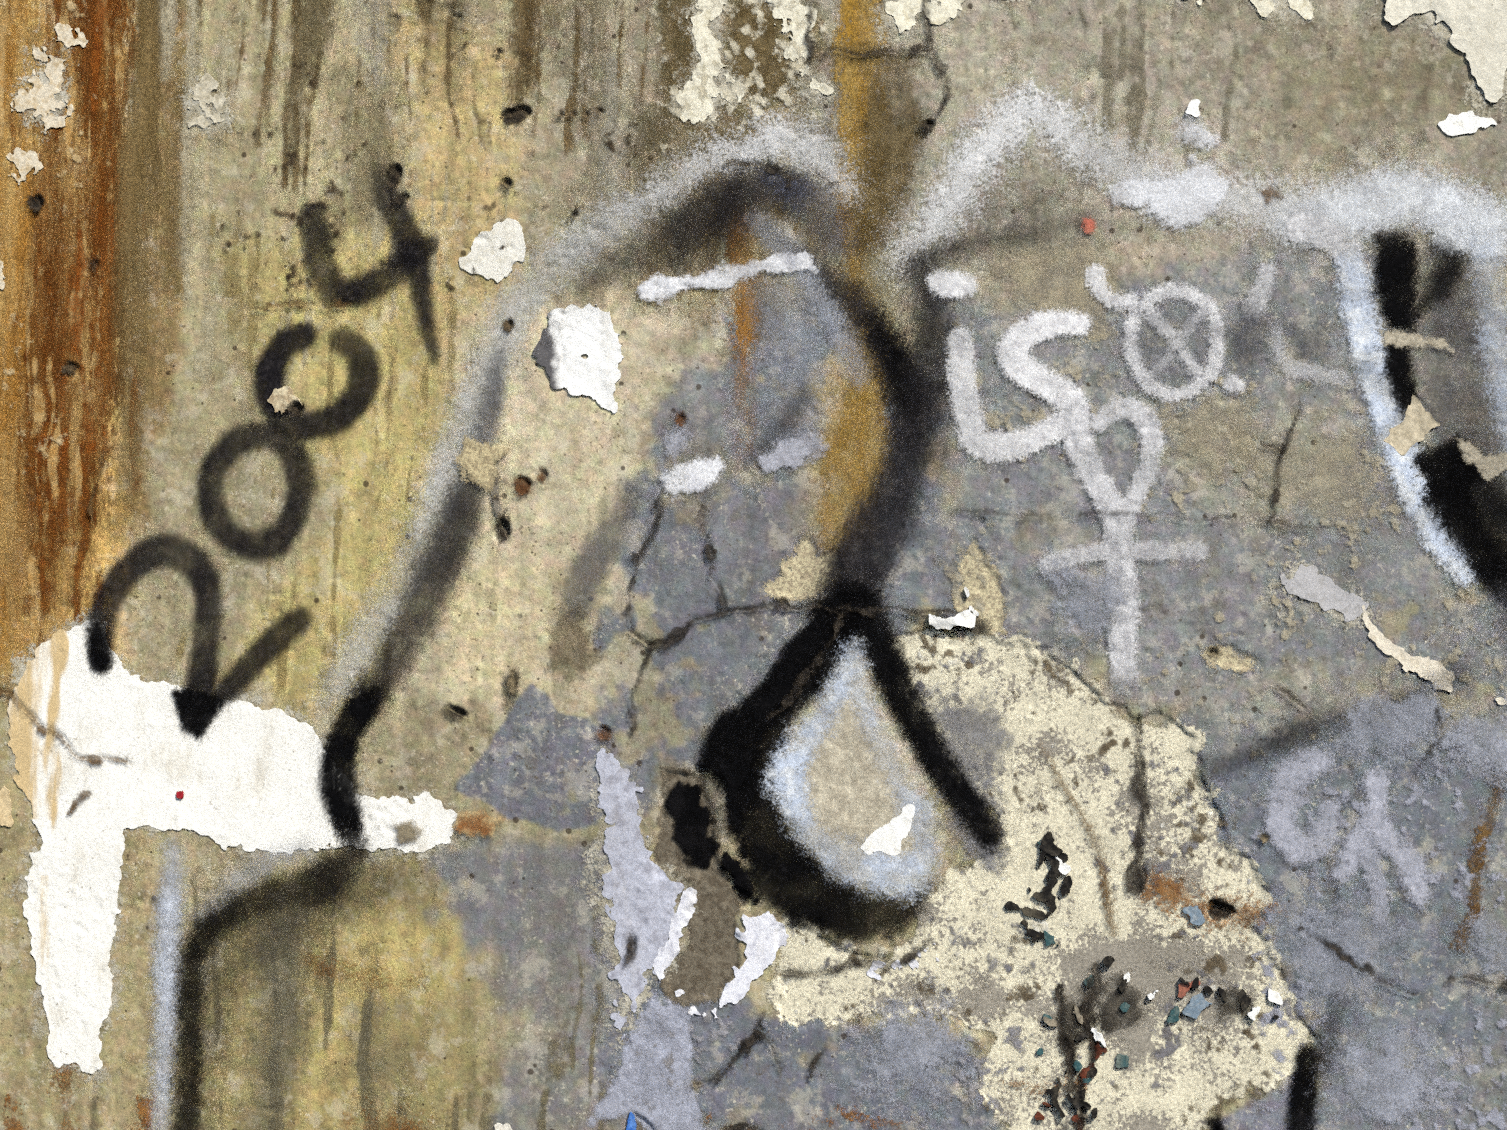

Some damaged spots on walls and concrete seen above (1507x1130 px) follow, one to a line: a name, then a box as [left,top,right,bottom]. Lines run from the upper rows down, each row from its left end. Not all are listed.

water stain [476,0,541,143]
water stain [564,10,587,152]
water stain [601,0,695,100]
water stain [725,0,791,98]
peeling [1374,0,1507,136]
peeling [459,218,526,283]
corrosion [827,0,894,493]
corrosion [0,0,143,646]
peeling [532,303,624,413]
crack [626,492,958,734]
crack [0,688,130,815]
spalling [653,535,1314,1130]